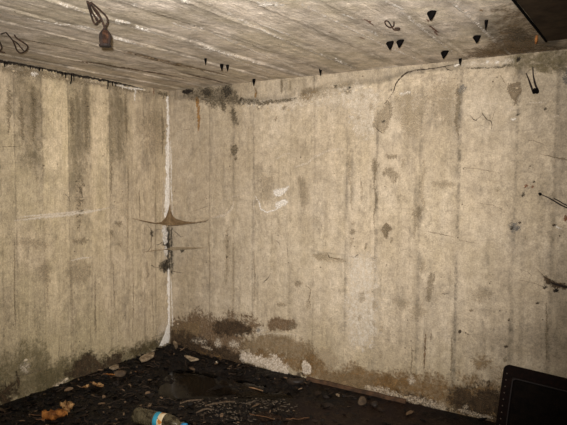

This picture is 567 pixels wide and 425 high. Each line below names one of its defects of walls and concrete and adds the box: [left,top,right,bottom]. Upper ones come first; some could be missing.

leakage [76,51,316,125]
crack [384,65,451,113]
leakage [0,225,501,422]